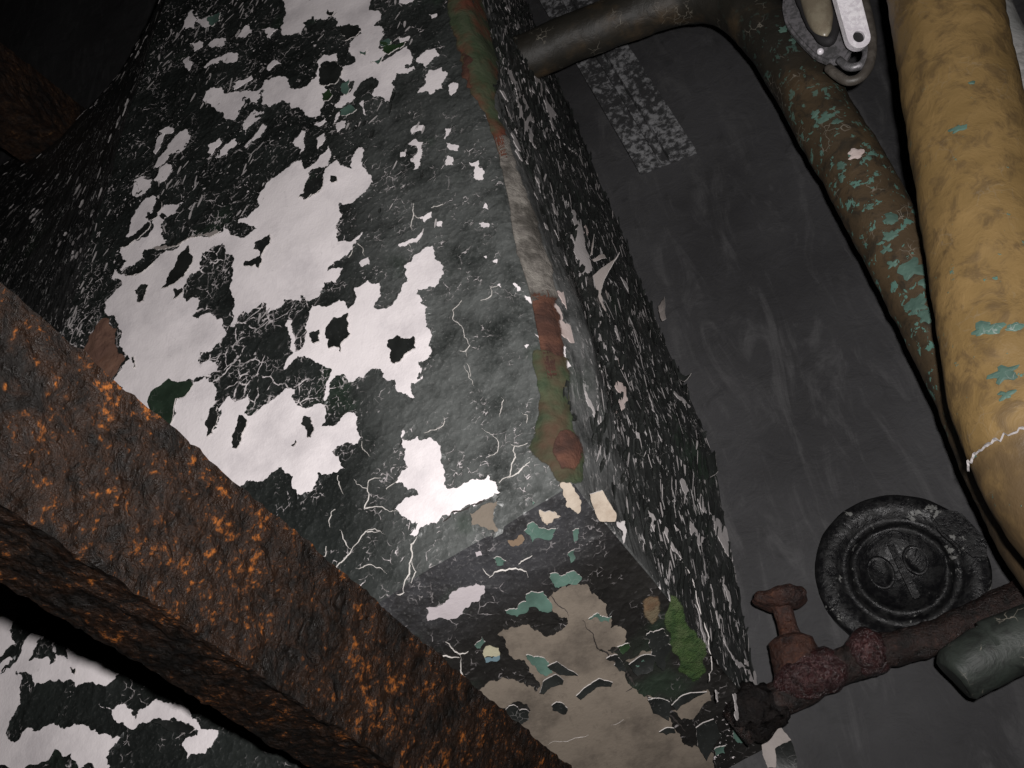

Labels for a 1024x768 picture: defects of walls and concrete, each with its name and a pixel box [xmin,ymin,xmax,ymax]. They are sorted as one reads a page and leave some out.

rust [447,0,507,158]
peeling [8,0,458,500]
rust [83,318,125,378]
crack [452,285,498,386]
crack [484,397,530,483]
rust [529,290,584,484]
peeling [391,0,758,768]
peeling [0,583,223,768]
crack [324,444,417,596]
crack [443,642,468,675]
crack [483,556,532,578]
water stain [643,596,707,681]